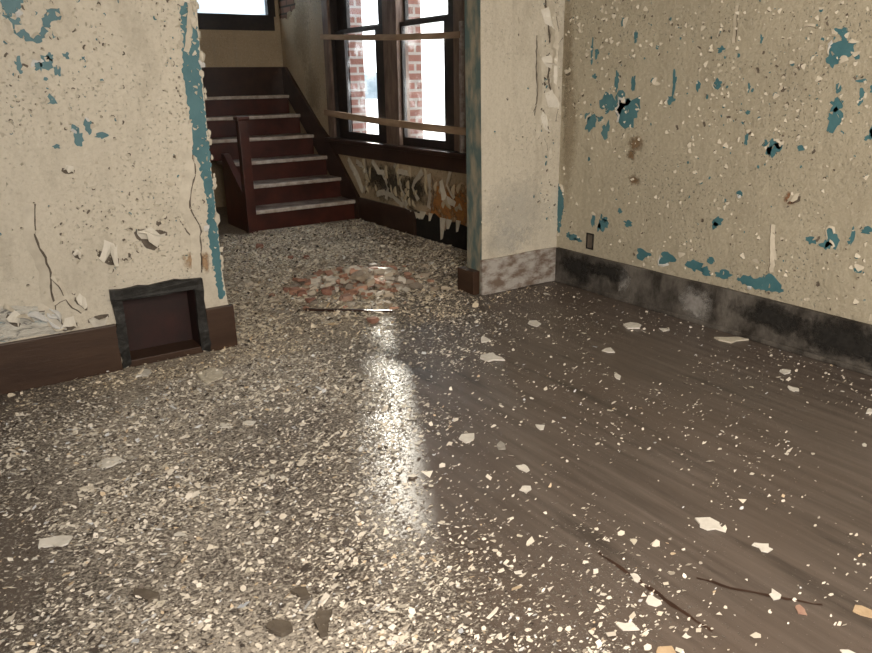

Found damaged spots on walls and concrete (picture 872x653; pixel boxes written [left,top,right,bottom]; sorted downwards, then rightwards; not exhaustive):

peeling [48,0,226,299]
flaking render [362,159,467,250]
crack [23,203,85,327]
leakage [560,256,628,288]
peeling [0,304,67,342]
leakage [680,293,708,317]
leakage [741,301,872,366]